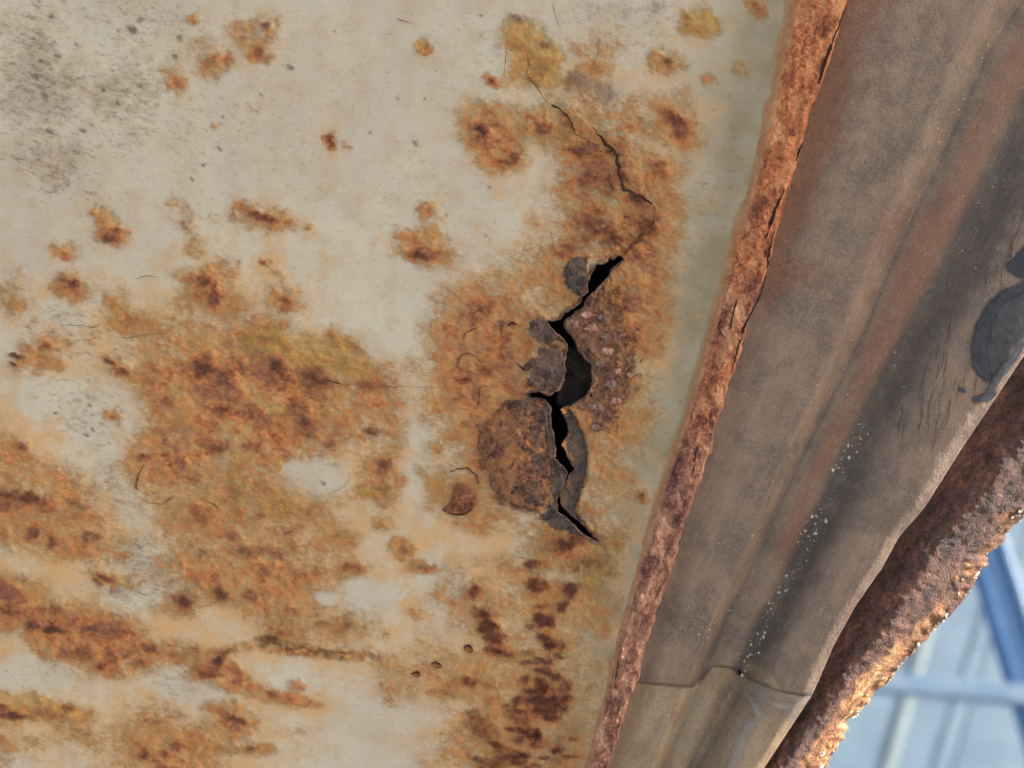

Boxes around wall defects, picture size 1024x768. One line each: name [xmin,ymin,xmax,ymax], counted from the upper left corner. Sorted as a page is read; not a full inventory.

rust [676,8,720,38]
rust [745,0,767,20]
rust [784,32,840,228]
crack [818,4,847,84]
crack [457,39,656,544]
crack [717,189,785,369]
rust [0,16,702,768]